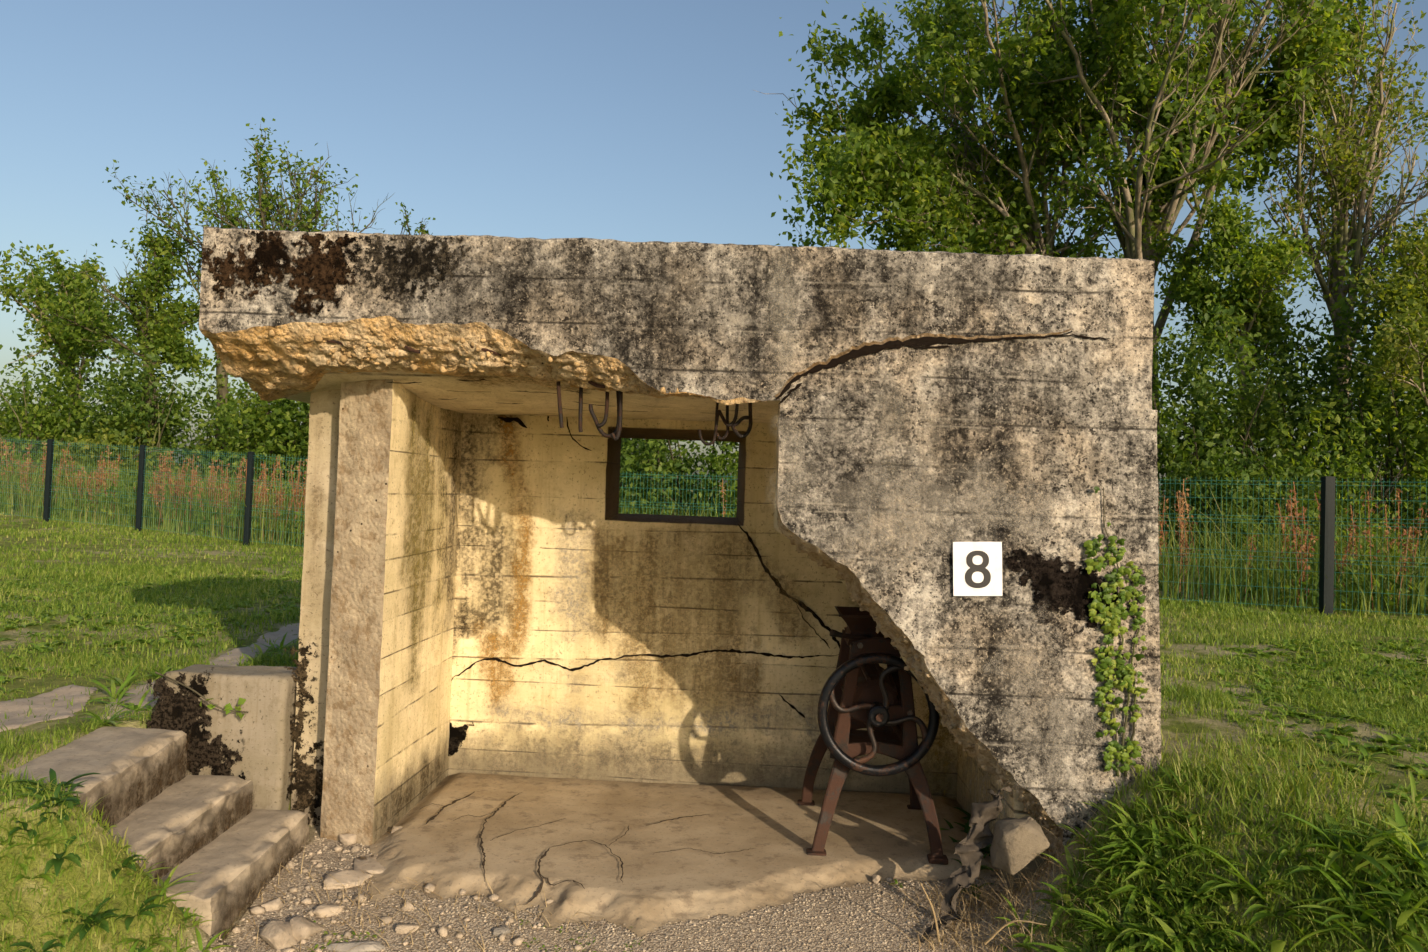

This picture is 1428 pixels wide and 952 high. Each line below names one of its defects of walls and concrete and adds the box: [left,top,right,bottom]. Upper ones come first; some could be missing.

crack [775,329,1110,441]
damp [402,400,514,682]
spalling [195,317,1063,860]
crack [451,524,840,681]
crack [780,695,805,718]
crack [420,791,754,904]